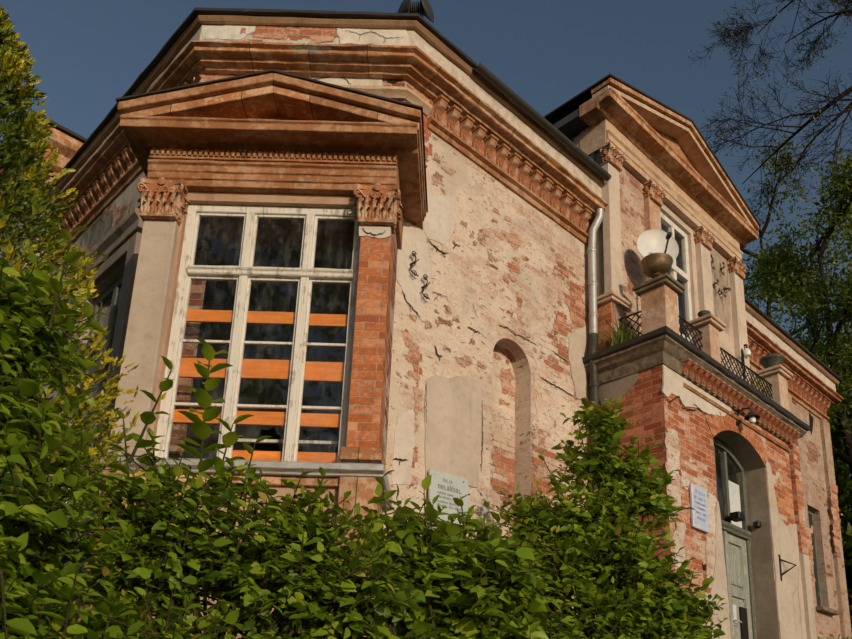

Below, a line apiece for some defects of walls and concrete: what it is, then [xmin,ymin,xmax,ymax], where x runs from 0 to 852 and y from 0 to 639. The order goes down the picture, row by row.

flaking render [240,26,343,43]
flaking render [407,305,460,329]
flaking render [402,329,423,432]
flaking render [443,345,487,369]
flaking render [460,216,587,506]
flaking render [409,446,420,489]
flaking render [802,438,821,470]
flaking render [777,476,795,520]
flaking render [830,484,843,562]
flaking render [806,525,815,582]